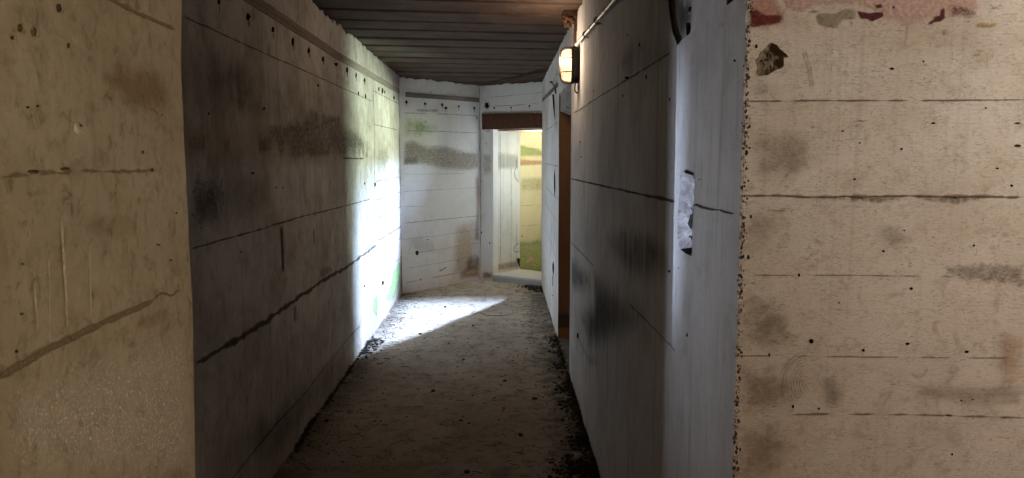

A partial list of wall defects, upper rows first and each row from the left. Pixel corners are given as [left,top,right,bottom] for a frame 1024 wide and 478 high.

flaking render [819,9,856,27]
crack [111,0,476,363]
spalling [677,169,695,256]
spalling [732,0,788,478]
crack [0,290,180,378]